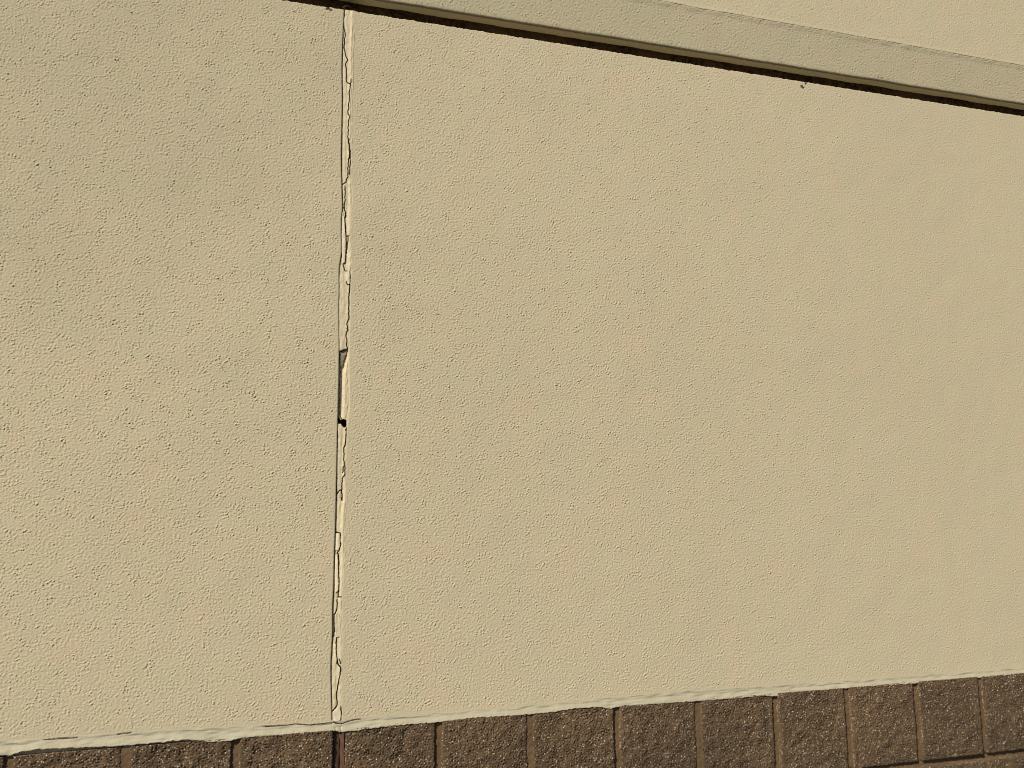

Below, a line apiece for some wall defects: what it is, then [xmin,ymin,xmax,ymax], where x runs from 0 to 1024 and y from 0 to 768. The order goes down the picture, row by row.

crack [340,8,351,348]
crack [264,430,359,767]